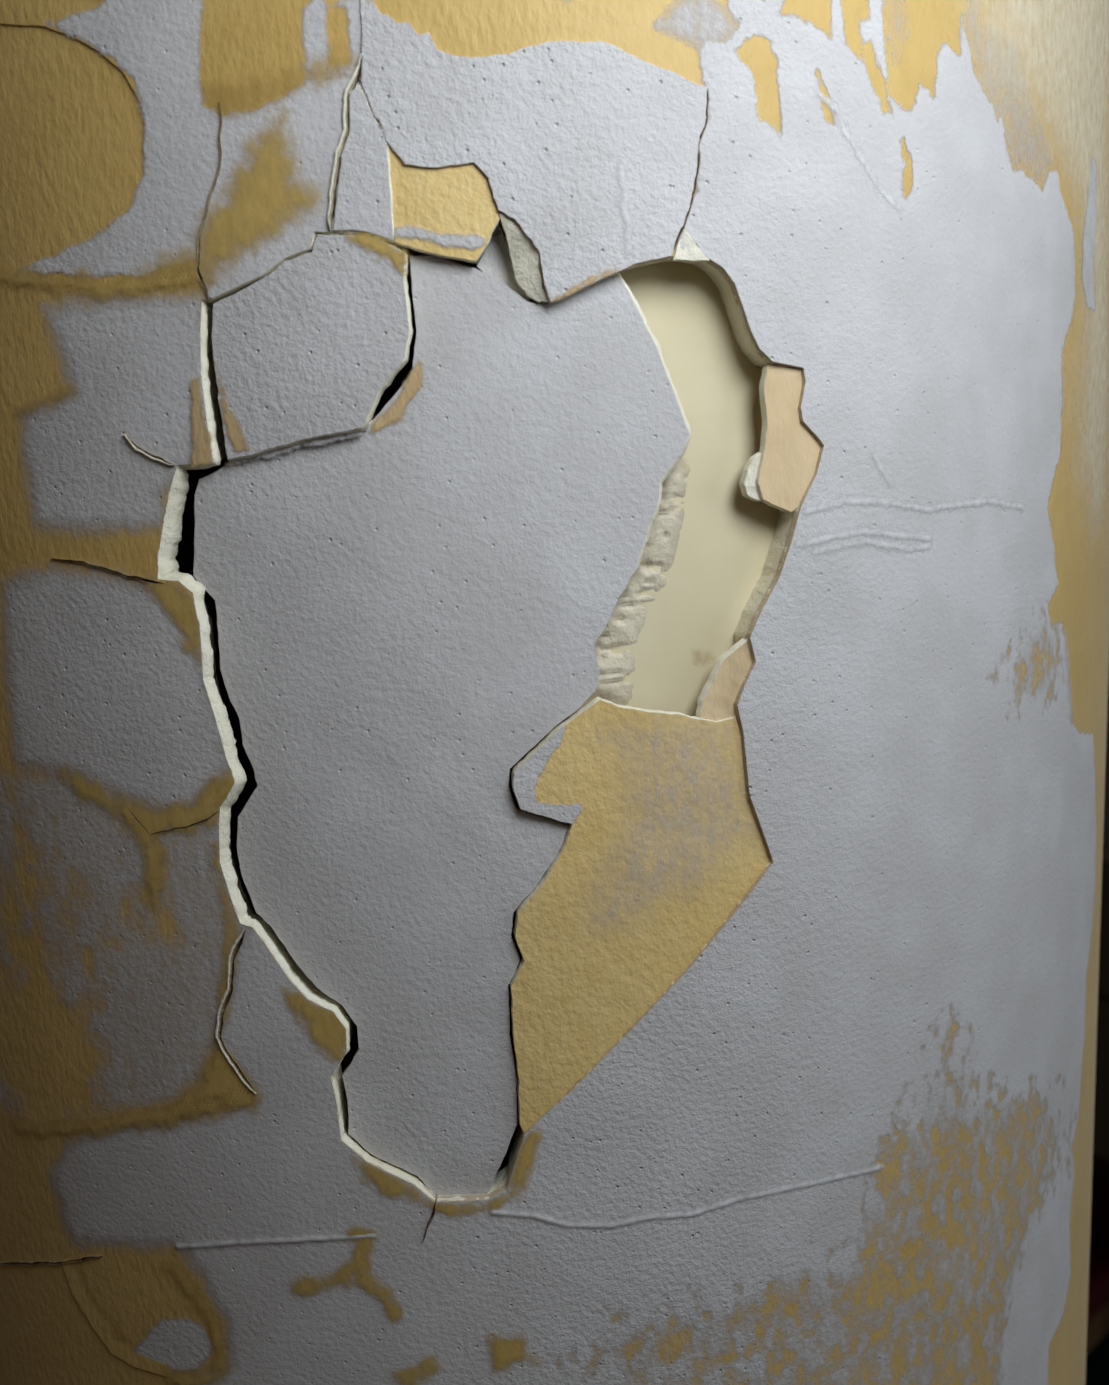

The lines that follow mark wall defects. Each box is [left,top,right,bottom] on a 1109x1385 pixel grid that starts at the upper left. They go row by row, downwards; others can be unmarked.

crack [196,101,222,299]
crack [327,53,362,230]
crack [673,90,709,251]
crack [124,434,175,466]
spalling [158,85,821,1201]
crack [125,805,219,835]
crack [215,929,258,1094]